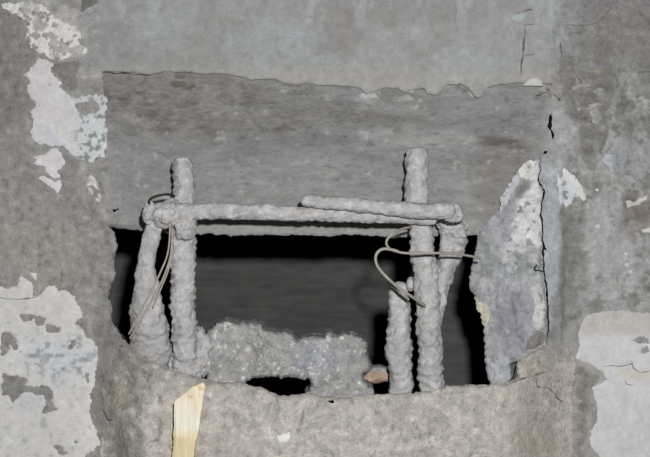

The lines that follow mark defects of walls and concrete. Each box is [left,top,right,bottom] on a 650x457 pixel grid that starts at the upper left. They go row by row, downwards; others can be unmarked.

spalling [1,0,414,294]
spalling [129,147,469,394]
peeling [523,77,543,86]
crack [534,114,554,338]
peeling [557,168,586,207]
peeling [0,273,101,457]
peeling [573,310,650,457]